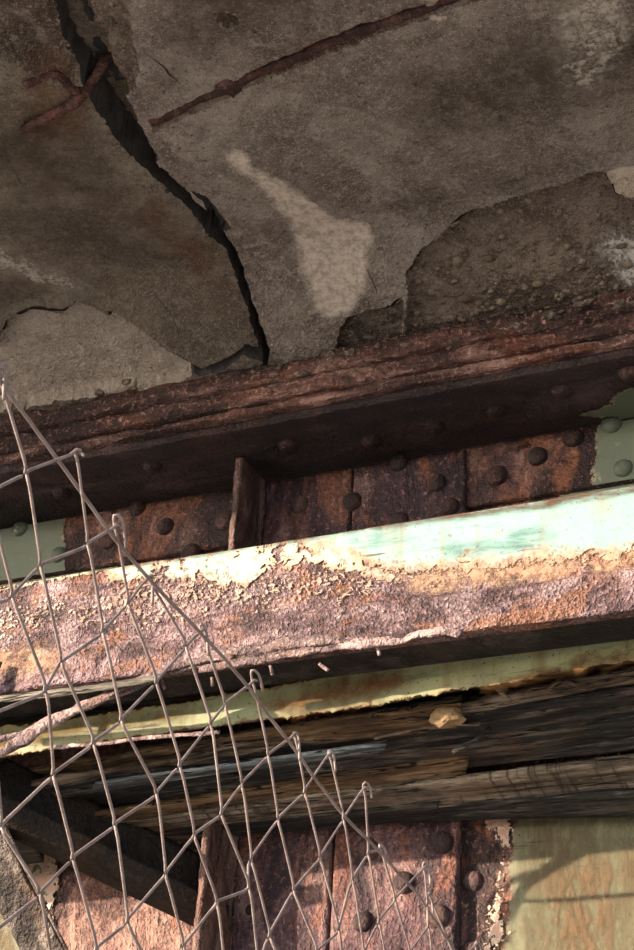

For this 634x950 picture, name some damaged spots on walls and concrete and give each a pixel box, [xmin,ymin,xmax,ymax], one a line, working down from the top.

crack [0,301,112,335]
spalling [0,301,192,413]
crack [54,0,270,376]
efflorescence [226,150,374,317]
spalling [308,166,634,367]
peeling [0,388,634,652]
corrosion [401,558,574,592]
corrosion [369,486,634,528]
corrosion [586,550,634,571]
peeling [0,639,634,757]
peeling [483,817,634,950]